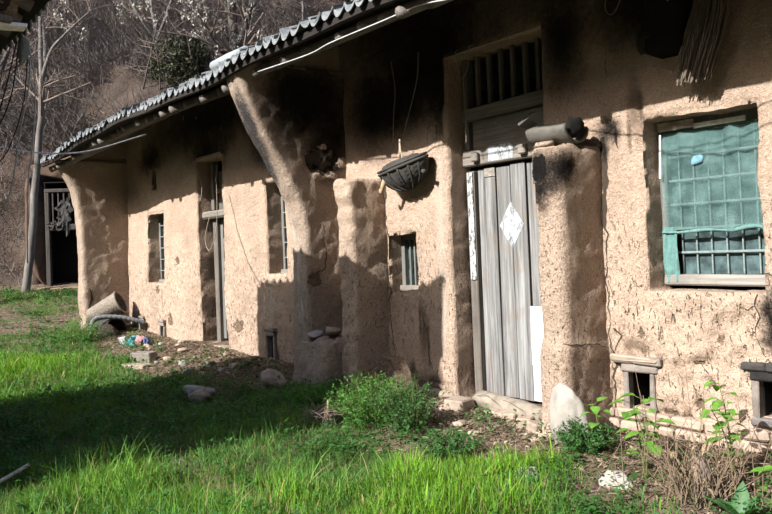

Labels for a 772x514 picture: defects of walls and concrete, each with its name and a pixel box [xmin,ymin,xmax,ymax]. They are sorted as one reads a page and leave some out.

water stain [532,157,546,205]
water stain [548,158,574,184]
spalling [305,267,322,287]
crack [563,135,623,408]
crack [740,294,762,351]